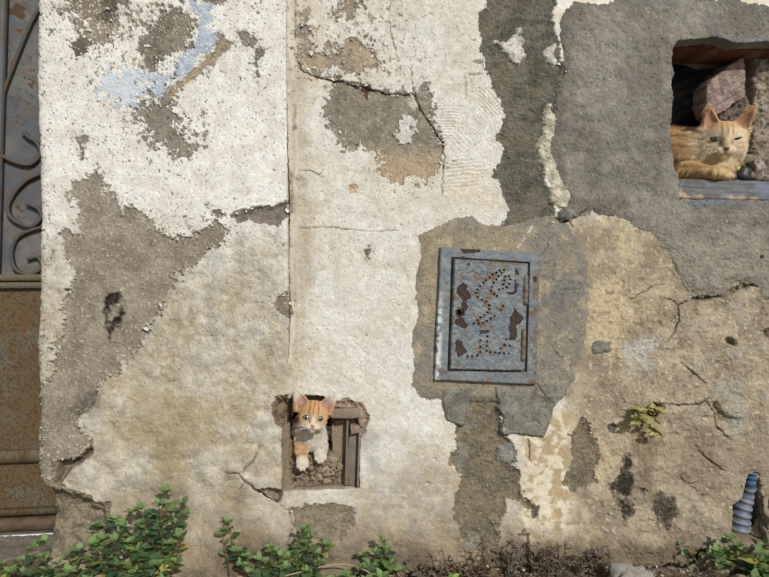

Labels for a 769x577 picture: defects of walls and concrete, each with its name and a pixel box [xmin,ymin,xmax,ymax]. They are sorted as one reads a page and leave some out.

peeling [51,0,265,162]
peeling [291,17,449,189]
crack [300,65,446,193]
peeling [40,163,290,559]
peeling [274,292,294,318]
crack [227,454,294,549]
leakage [610,443,652,520]
leakage [653,491,676,528]